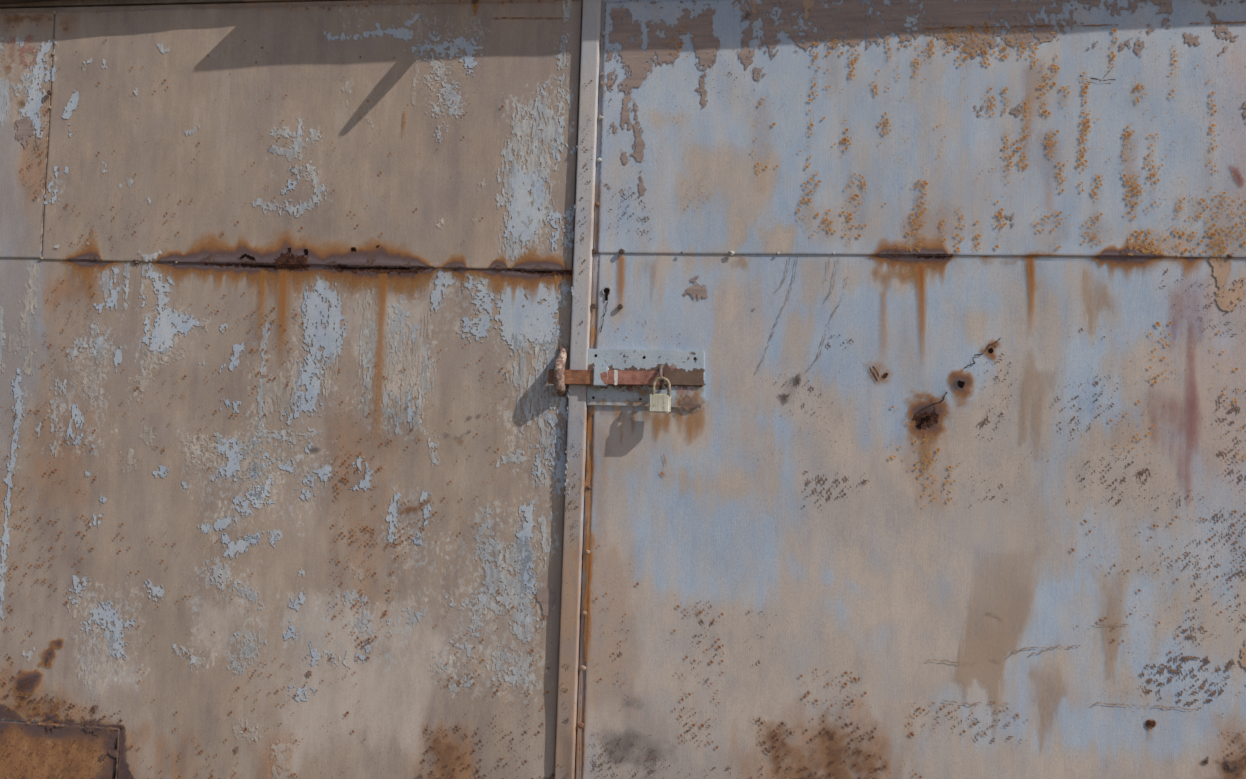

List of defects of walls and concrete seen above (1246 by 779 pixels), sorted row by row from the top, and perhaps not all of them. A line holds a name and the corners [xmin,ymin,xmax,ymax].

peeling [0,34,57,150]
peeling [62,90,80,137]
rust [751,22,1246,343]
peeling [1194,0,1245,56]
rust [1,456,103,641]
rust [41,194,144,375]
peeling [81,599,137,660]
peeling [0,250,228,619]
rust [133,185,573,779]
peeling [179,0,1202,702]
rust [753,669,890,779]